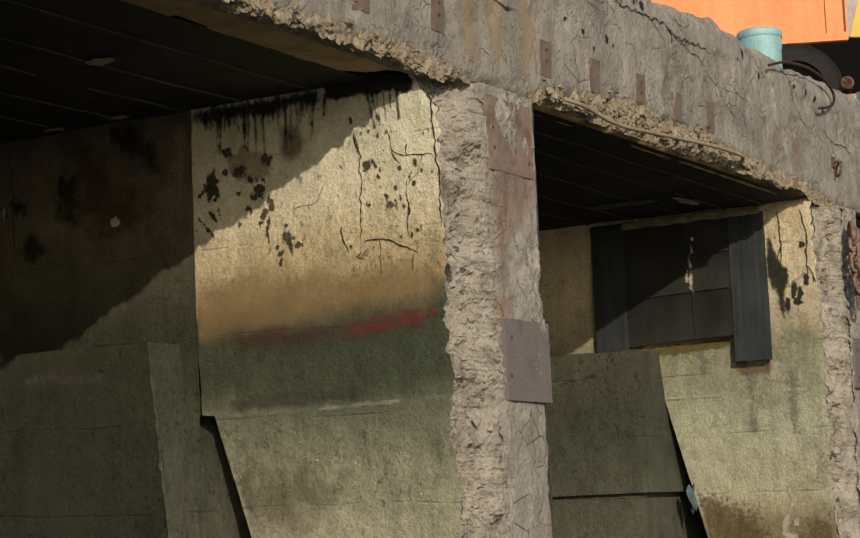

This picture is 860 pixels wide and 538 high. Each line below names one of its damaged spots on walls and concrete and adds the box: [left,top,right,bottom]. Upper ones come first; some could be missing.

damp [193,71,412,151]
spalling [189,0,510,538]
crack [340,83,442,272]
spalling [527,77,860,538]
damp [766,237,814,317]
damp [782,486,799,538]